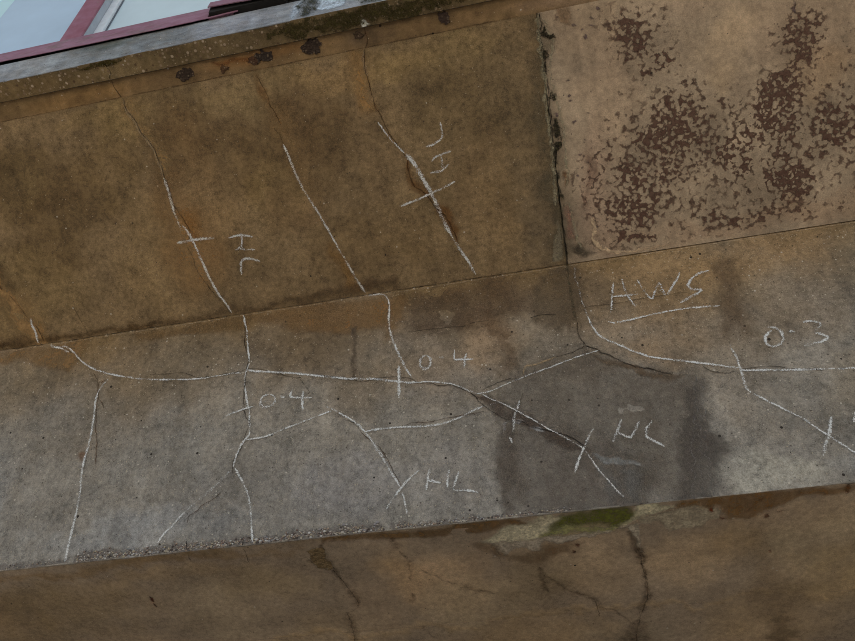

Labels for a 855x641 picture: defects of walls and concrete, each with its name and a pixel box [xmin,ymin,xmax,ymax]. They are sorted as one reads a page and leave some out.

leakage [317,0,345,10]
crack [363,28,458,243]
peeling [572,7,855,254]
crack [215,265,671,472]
leakage [478,361,665,507]
leakage [322,389,851,562]